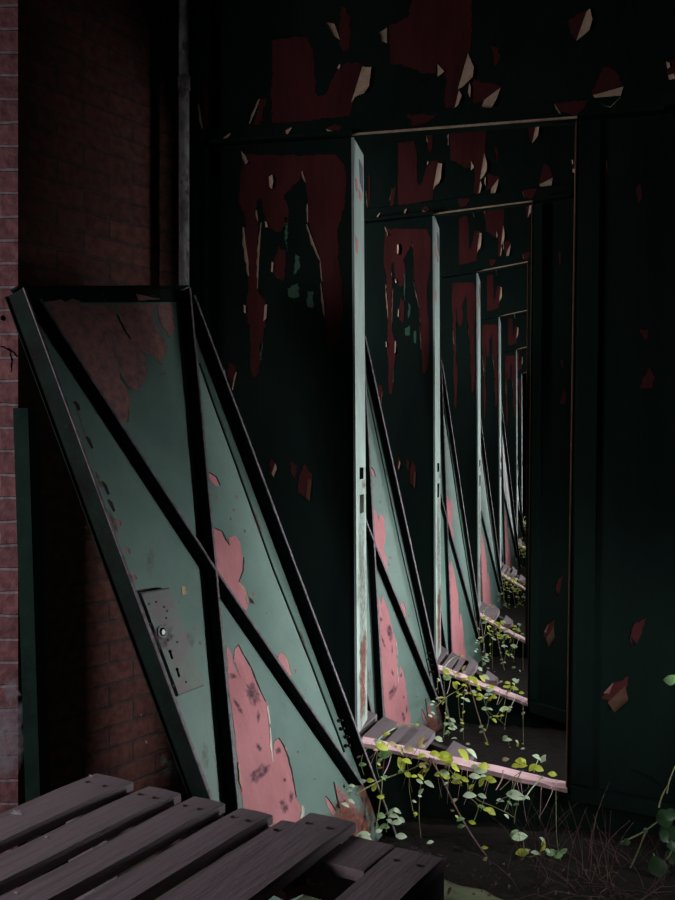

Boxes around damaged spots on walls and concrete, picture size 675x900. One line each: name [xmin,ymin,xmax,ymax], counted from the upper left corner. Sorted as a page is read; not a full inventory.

peeling [249,7,371,134]
peeling [379,0,501,109]
peeling [568,9,592,41]
peeling [554,67,623,116]
peeling [239,151,370,377]
peeling [379,113,523,426]
peeling [214,527,256,611]
peeling [371,467,391,570]
peeling [226,644,305,827]
peeling [372,597,440,730]
peeling [601,676,628,712]
corrosion [336,785,372,841]